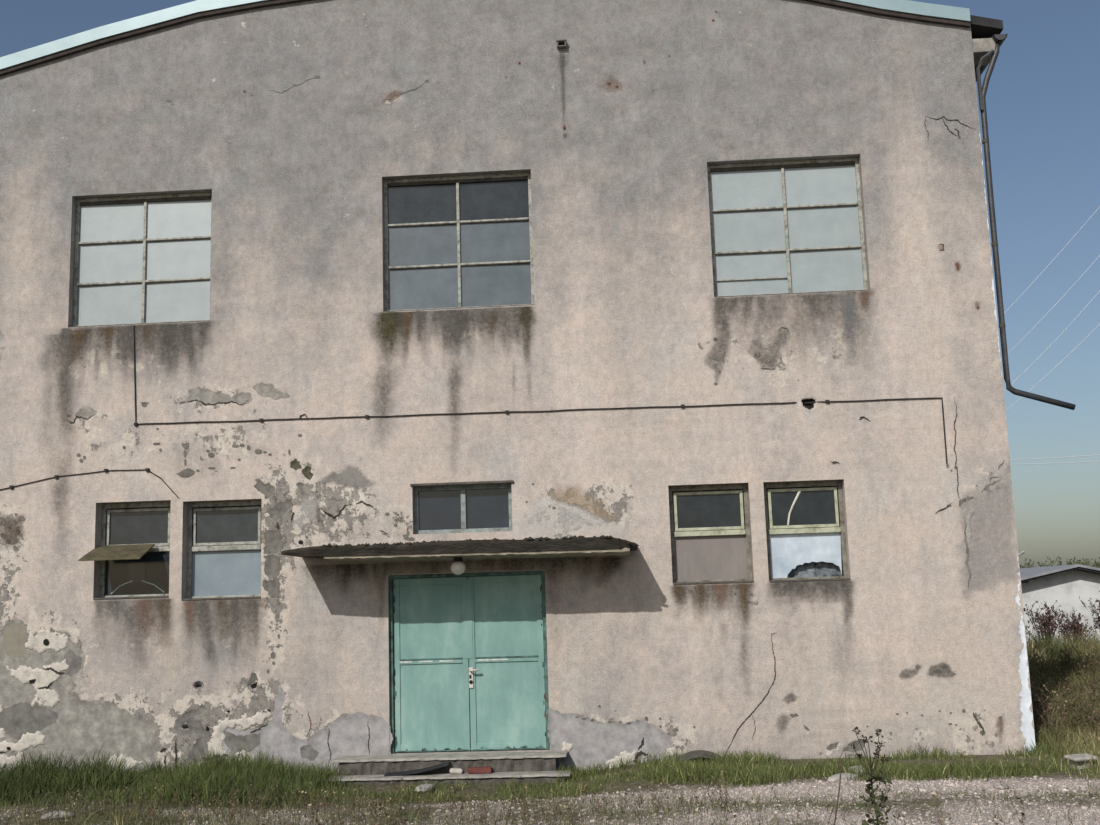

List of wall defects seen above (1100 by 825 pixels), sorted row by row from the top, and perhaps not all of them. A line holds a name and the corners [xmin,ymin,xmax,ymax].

crack [925,116,970,139]
damp [377,306,531,350]
damp [716,296,748,317]
damp [57,321,211,418]
spalling [178,382,290,405]
crack [936,400,1004,588]
flaking render [254,450,371,618]
damp [184,599,260,635]
damp [673,583,748,619]
peeling [1015,558,1036,753]
spalling [0,618,397,774]
spalling [506,693,681,769]